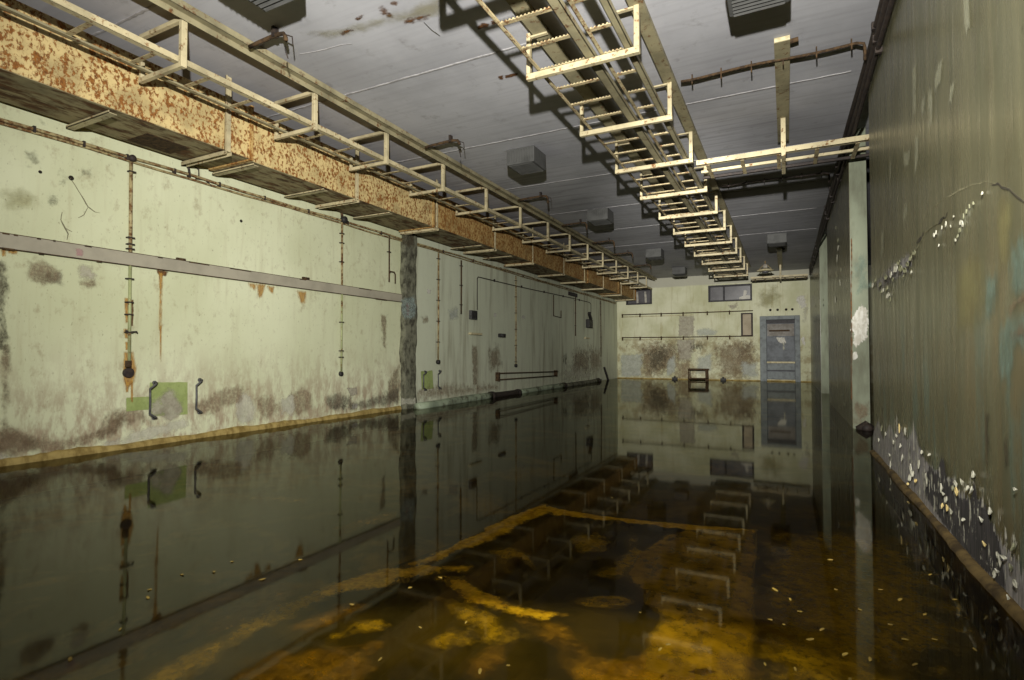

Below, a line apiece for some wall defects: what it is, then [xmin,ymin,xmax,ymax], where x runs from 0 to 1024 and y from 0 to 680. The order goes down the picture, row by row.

crack [898,106,1024,267]
peeling [933,191,983,247]
leakage [0,263,9,368]
rust [0,232,402,354]
leakage [641,344,689,376]
peeling [850,304,869,360]
peeling [871,250,916,302]
leakage [329,370,445,408]
leakage [0,412,186,459]
peeling [873,415,1024,610]